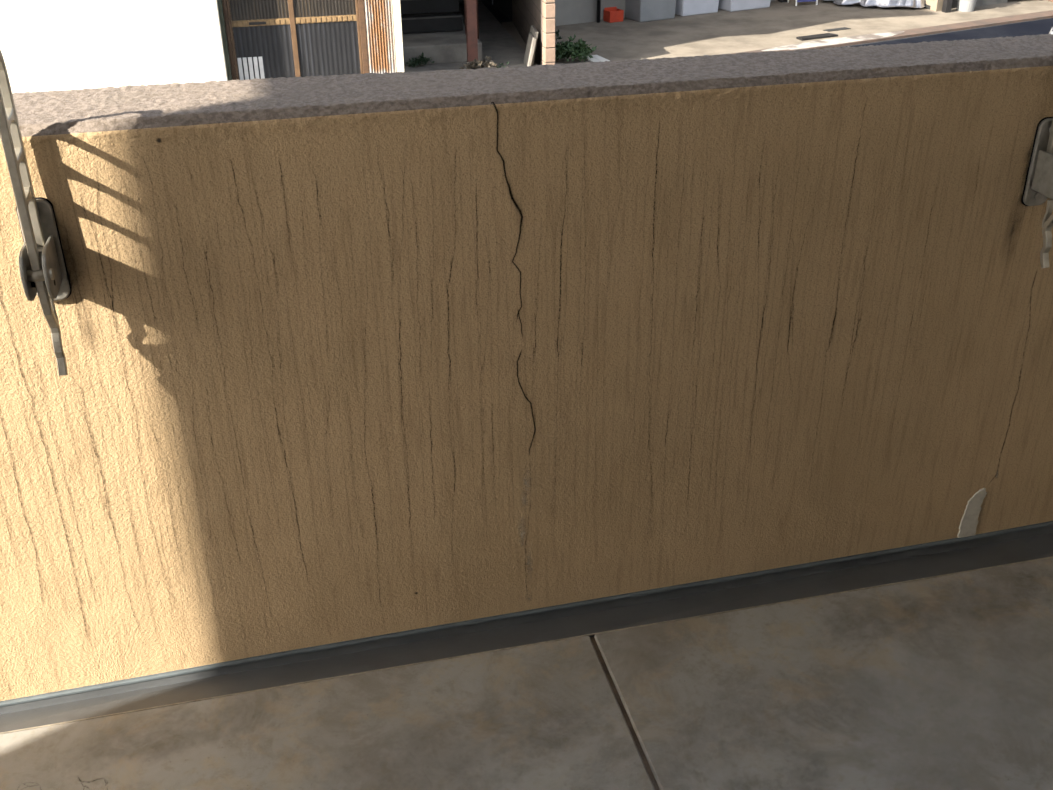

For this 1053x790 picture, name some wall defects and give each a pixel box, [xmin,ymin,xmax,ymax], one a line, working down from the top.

crack [491,102,536,590]